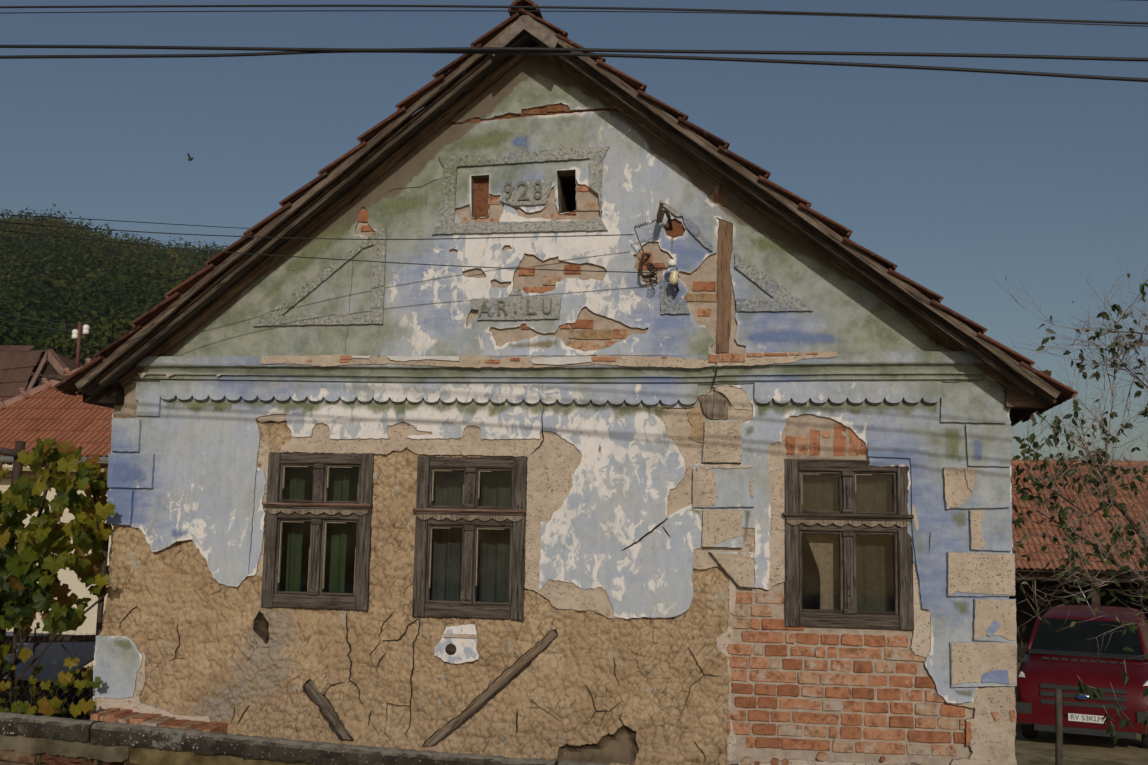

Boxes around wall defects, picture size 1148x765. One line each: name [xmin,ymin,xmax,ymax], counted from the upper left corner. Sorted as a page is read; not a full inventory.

spalling [261,182,837,369]
crack [622,518,670,551]
spalling [91,382,1017,765]
crack [325,610,420,738]
crack [516,658,624,733]
crack [680,647,717,716]
peeling [0,734,318,765]